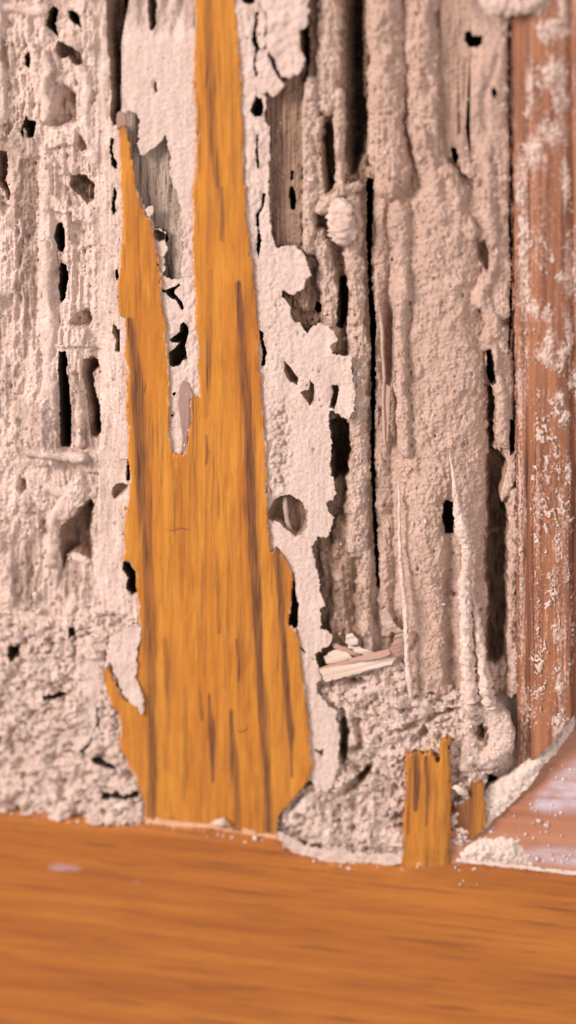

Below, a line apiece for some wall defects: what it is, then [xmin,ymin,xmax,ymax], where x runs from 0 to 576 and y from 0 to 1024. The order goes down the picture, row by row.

peeling [120,0,200,459]
peeling [234,0,356,793]
crack [366,178,381,588]
peeling [73,623,144,749]
peeling [400,736,486,868]